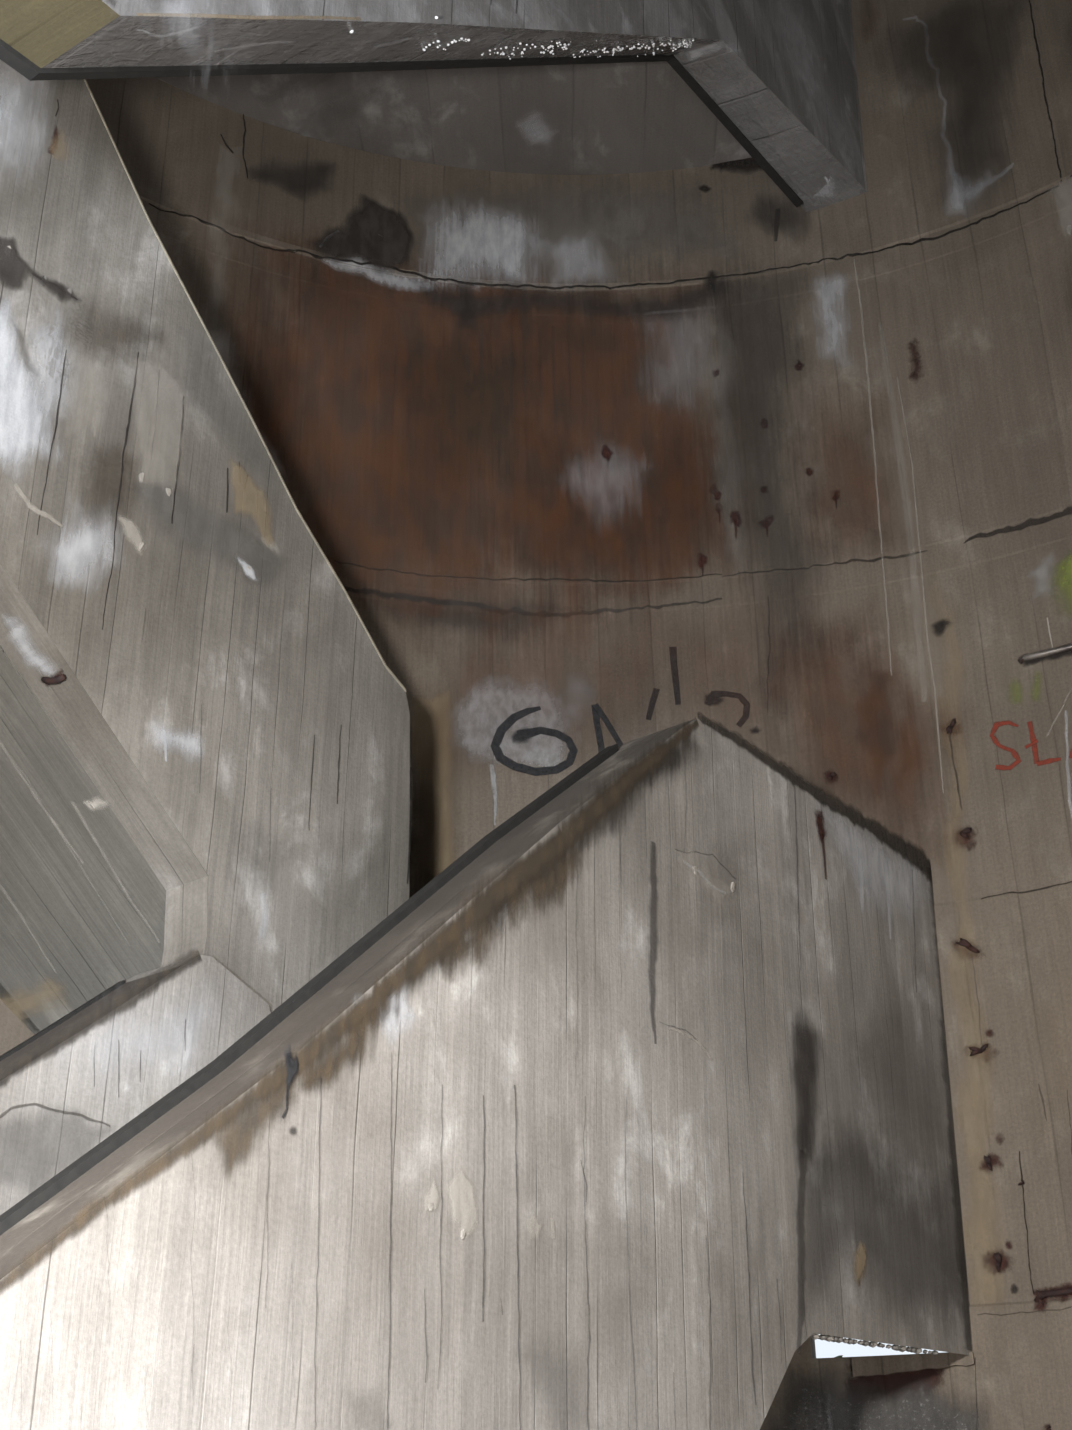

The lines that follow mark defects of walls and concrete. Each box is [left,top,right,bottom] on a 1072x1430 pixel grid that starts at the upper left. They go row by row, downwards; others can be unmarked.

crack [149,0,1072,290]
damp [439,213,523,272]
damp [330,257,724,314]
corrosion [710,484,741,538]
crack [964,507,1072,543]
crack [334,550,927,616]
crack [981,881,1072,899]
damp [0,713,941,1291]
damp [942,998,972,1351]
corrosion [987,1242,1011,1272]
corrosion [1012,1284,1072,1311]